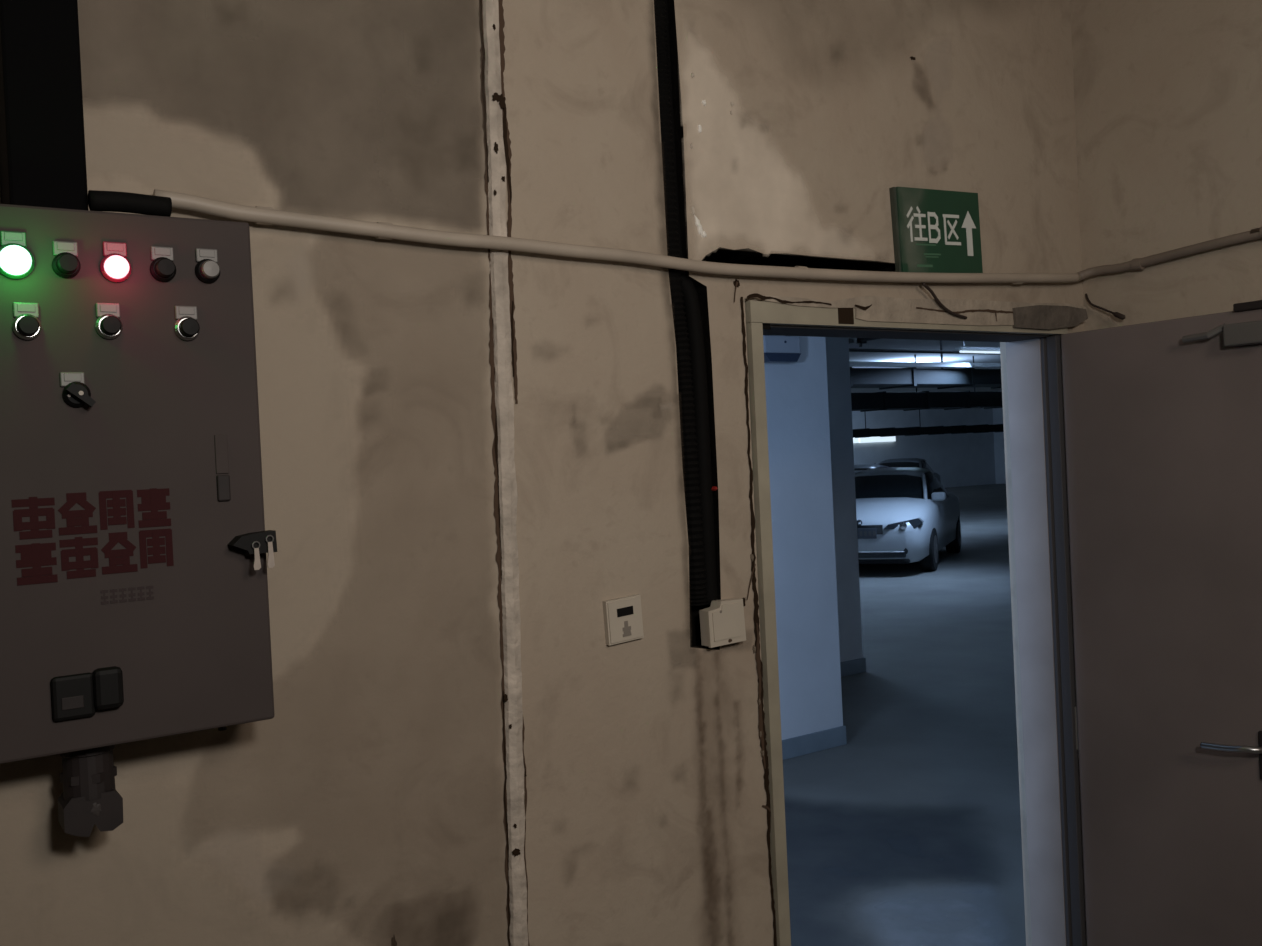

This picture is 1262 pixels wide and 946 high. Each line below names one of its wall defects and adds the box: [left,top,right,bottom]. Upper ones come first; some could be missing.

crack [479,0,530,946]